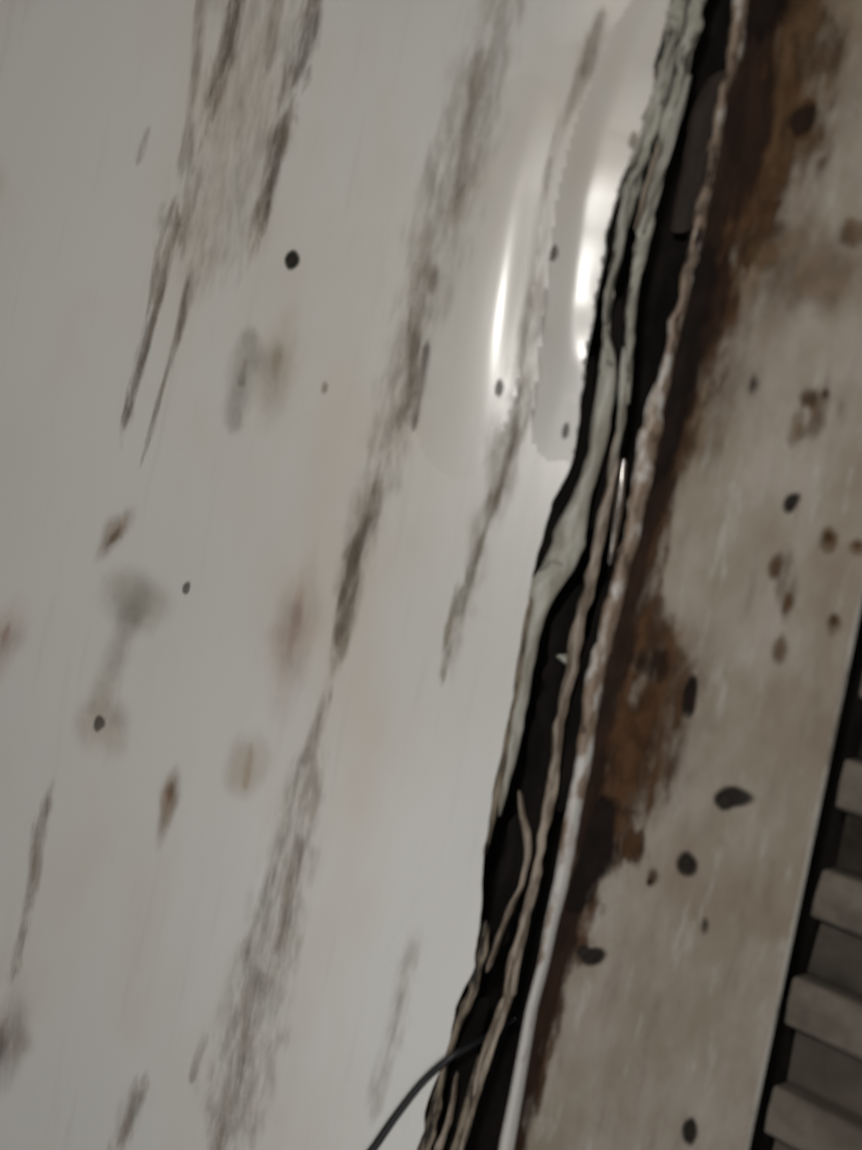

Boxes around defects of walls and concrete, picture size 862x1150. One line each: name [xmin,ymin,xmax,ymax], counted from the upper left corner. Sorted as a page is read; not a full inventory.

damp [285,251,299,269]
damp [178,288,187,338]
spalling [784,494,800,512]
peeling [418,0,707,1150]
rust [514,0,842,1150]
spalling [715,787,752,810]